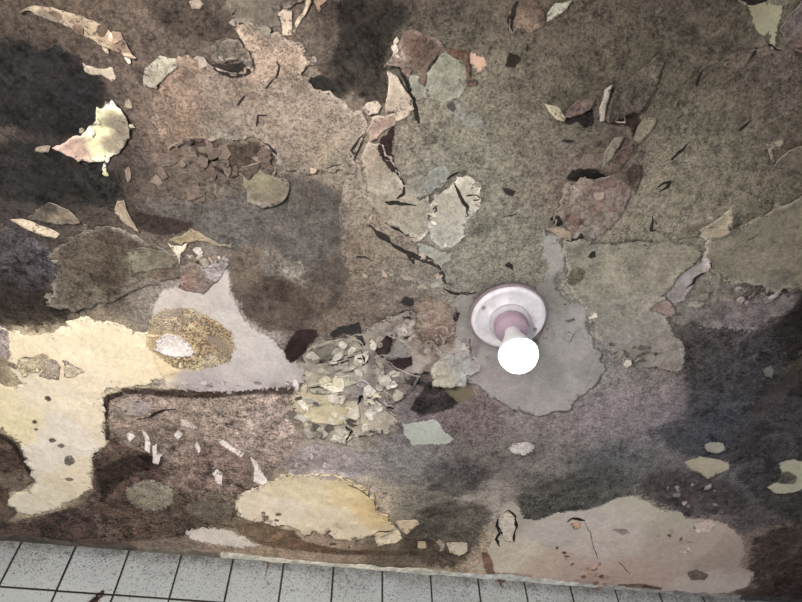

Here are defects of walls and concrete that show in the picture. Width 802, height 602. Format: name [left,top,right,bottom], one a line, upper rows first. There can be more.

damp [0,36,127,212]
peeling [18,5,136,63]
peeling [34,99,135,176]
peeling [83,63,117,82]
damp [134,173,348,271]
peeling [143,0,488,290]
peeling [545,85,626,123]
crack [657,181,672,192]
crack [671,144,688,161]
spalling [0,164,802,552]
damp [516,296,802,599]
spalling [472,495,754,594]